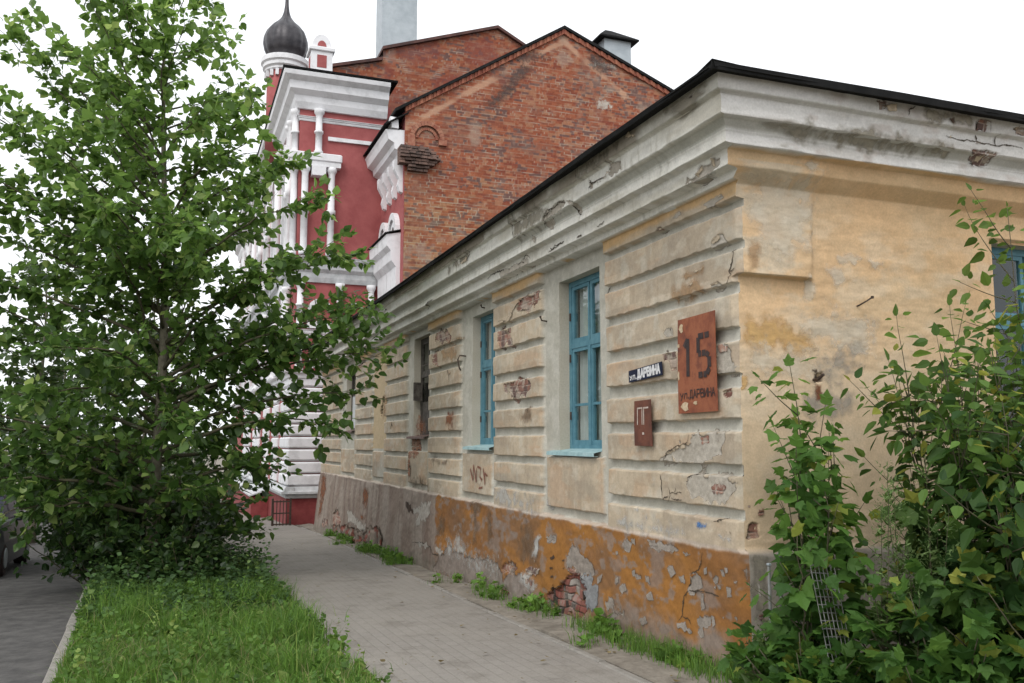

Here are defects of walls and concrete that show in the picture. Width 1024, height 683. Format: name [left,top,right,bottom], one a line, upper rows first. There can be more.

peeling [686,158,720,186]
flaking render [968,149,997,167]
crack [950,135,1023,149]
flaking render [498,291,540,351]
flaking render [504,377,531,404]
flaking render [659,429,737,505]
crack [660,473,708,501]
flaking render [322,508,382,546]
peeling [615,538,690,556]
flaking render [547,544,653,624]
crack [678,556,719,624]
peeling [667,556,768,638]